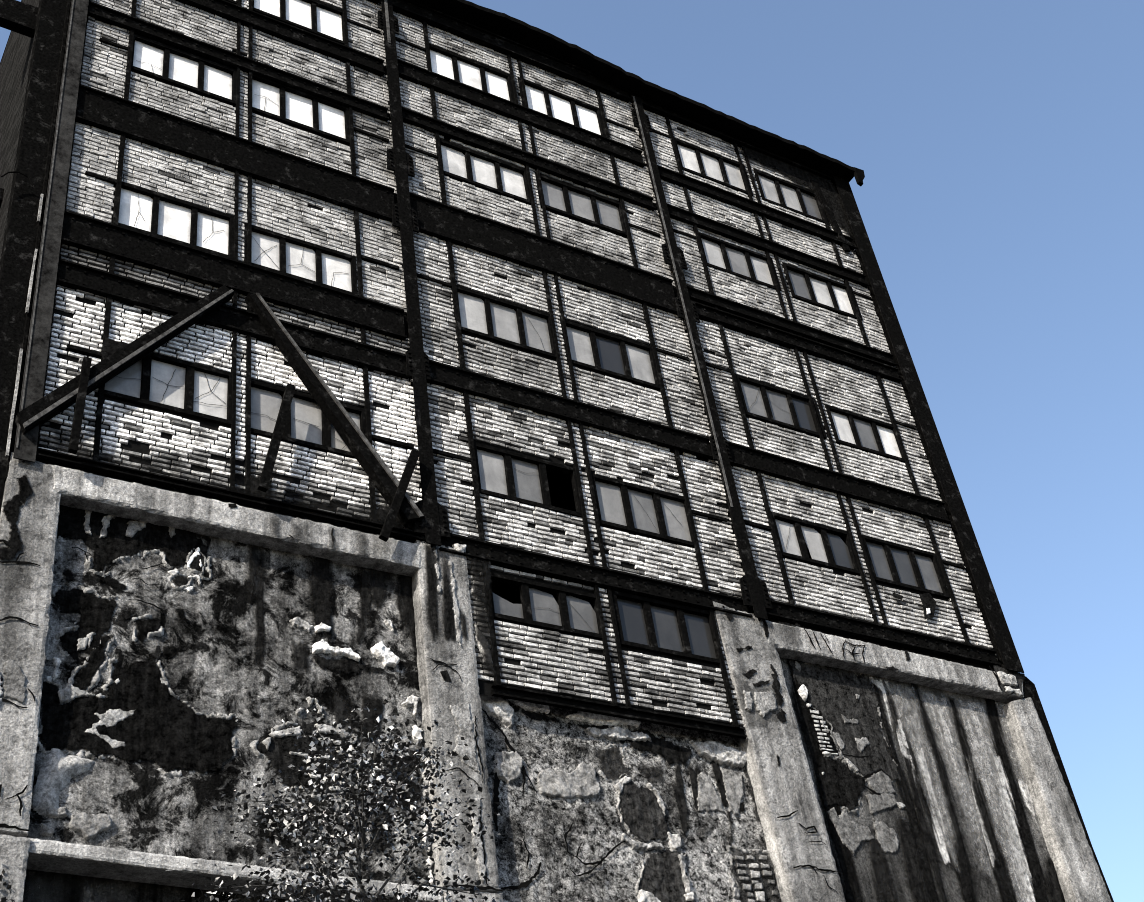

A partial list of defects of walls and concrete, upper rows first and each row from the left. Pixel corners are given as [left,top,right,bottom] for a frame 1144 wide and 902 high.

spalling [0,474,33,559]
peeling [0,505,400,808]
spalling [401,695,435,885]
crack [445,708,541,892]
crack [564,823,626,876]
flaking render [446,694,760,902]
flaking render [726,844,781,902]
spalling [743,664,786,722]
water stain [787,659,863,902]
peeling [789,659,905,856]
water stain [869,677,977,902]
water stain [949,698,1065,902]